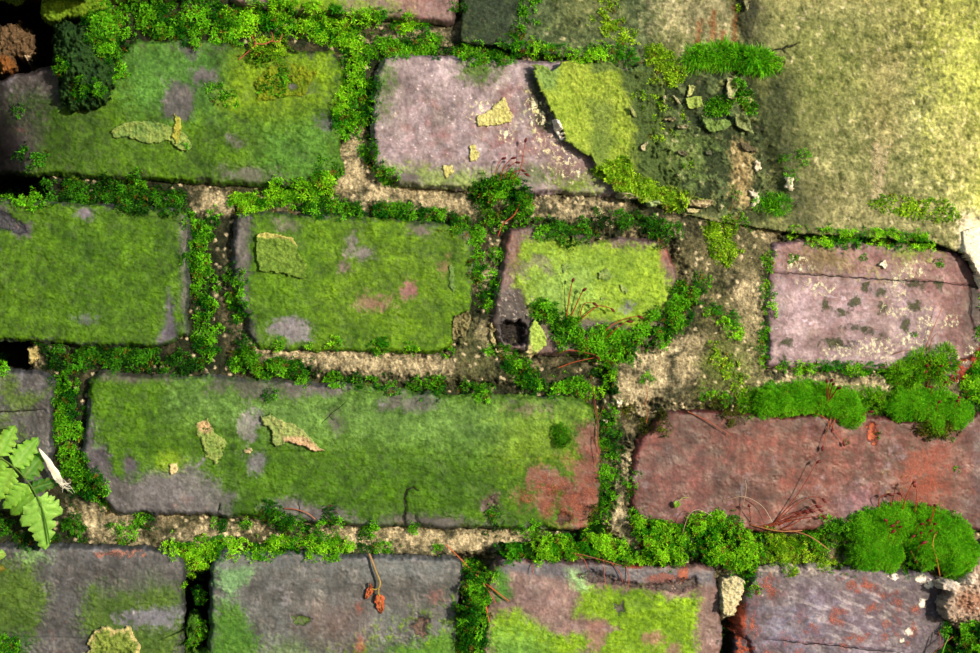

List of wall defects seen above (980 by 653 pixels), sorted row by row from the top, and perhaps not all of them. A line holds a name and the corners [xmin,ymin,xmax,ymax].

flaking render [961,227,980,289]
spalling [501,320,525,344]